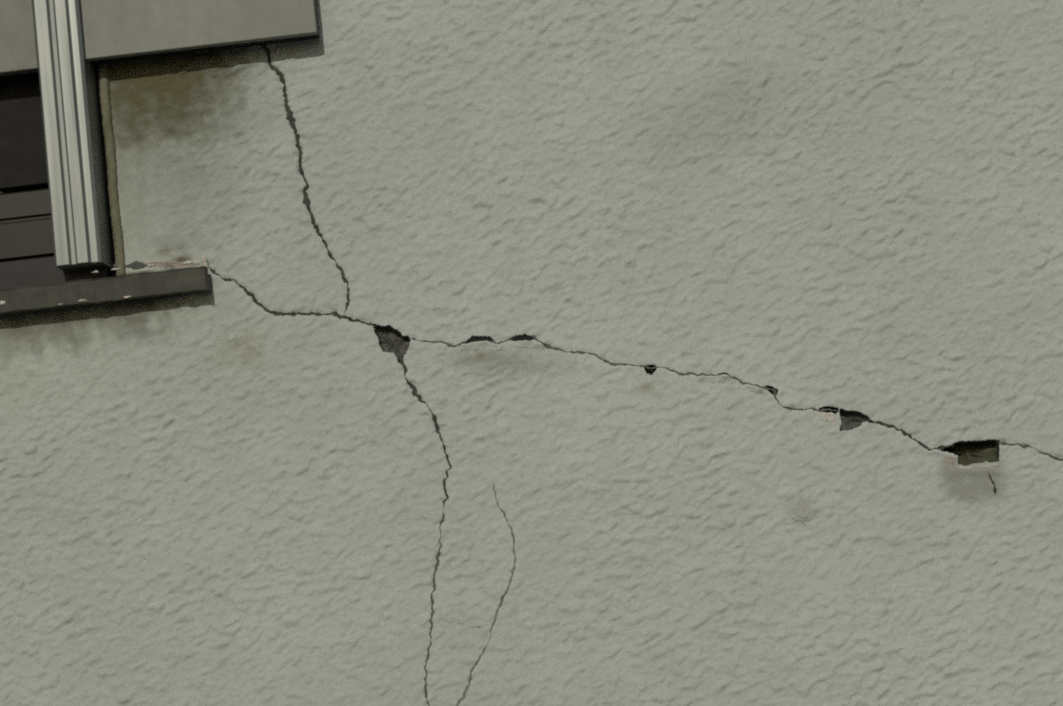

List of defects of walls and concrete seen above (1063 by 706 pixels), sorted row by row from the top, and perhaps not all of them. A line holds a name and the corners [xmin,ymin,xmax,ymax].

crack [209,45,376,327]
spalling [373,324,410,362]
spalling [819,407,869,431]
crack [864,418,951,451]
spalling [941,440,999,497]
crack [996,442,1063,461]
crack [399,334,837,706]